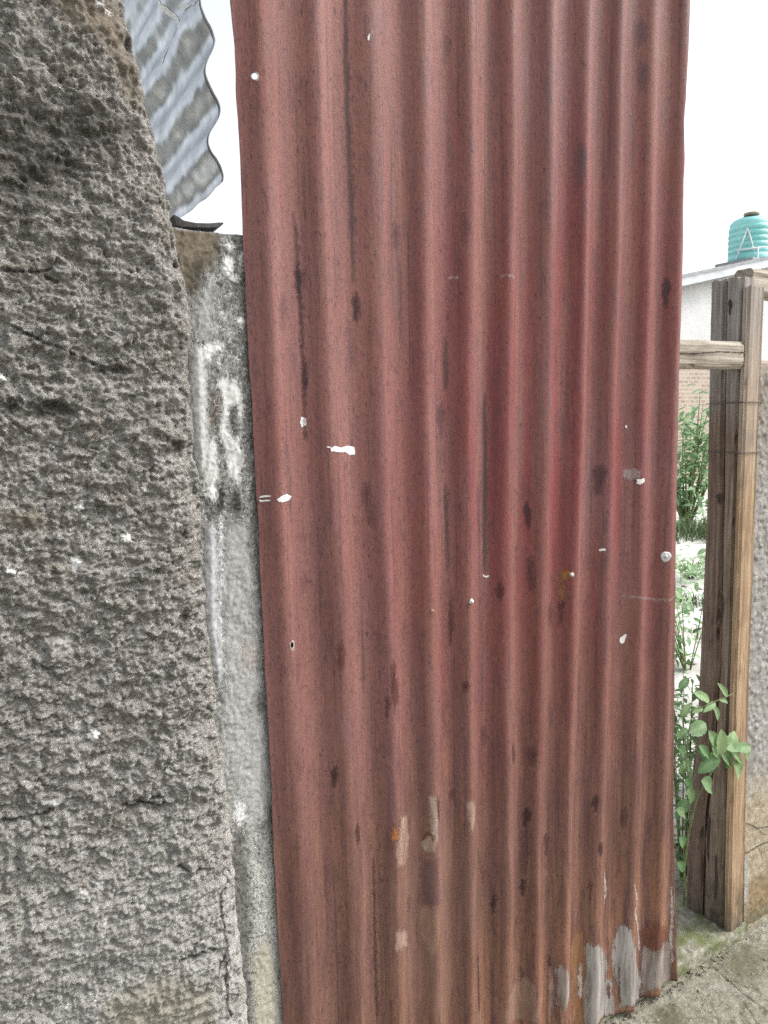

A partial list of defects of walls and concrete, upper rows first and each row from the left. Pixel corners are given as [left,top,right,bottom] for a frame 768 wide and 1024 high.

leakage [203,375,245,501]
peeling [391,816,409,866]
peeling [422,796,438,852]
peeling [395,931,407,951]
corrosion [502,969,553,1024]
corrosion [570,931,586,1024]
peeling [554,884,674,1024]
corrosion [645,925,667,951]